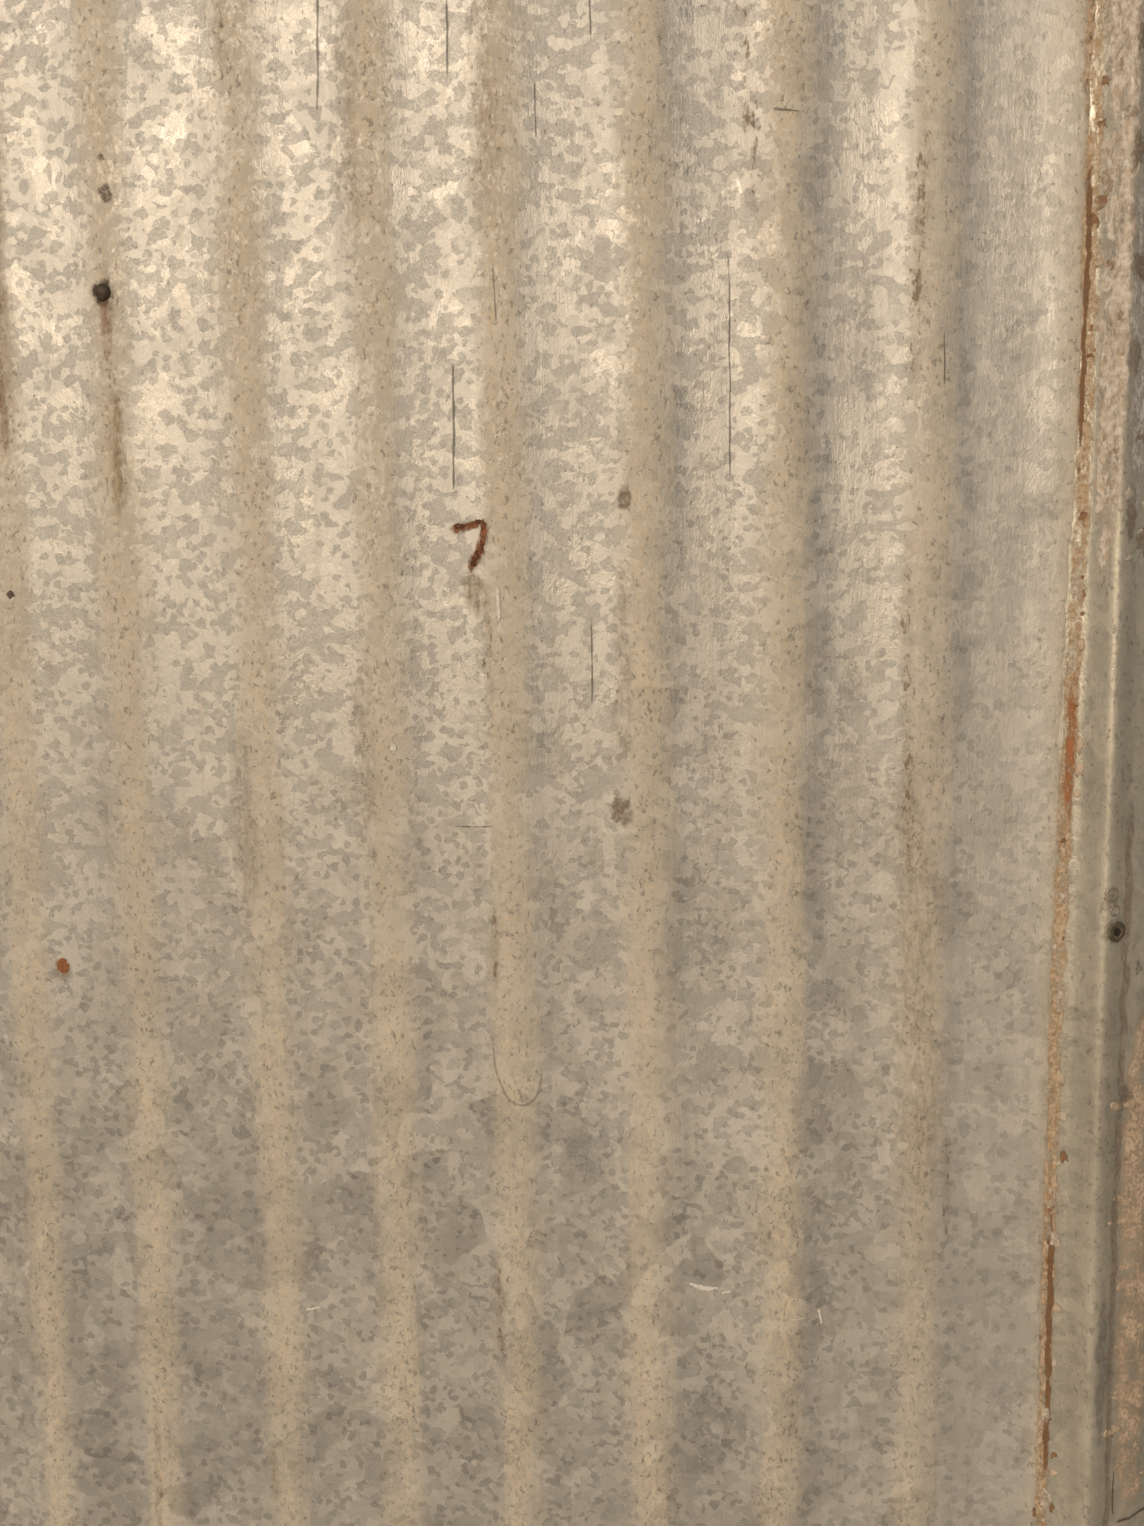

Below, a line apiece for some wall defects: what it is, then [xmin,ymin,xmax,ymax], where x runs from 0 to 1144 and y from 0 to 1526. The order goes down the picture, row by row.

corrosion [453,518,487,605]
corrosion [1032,0,1114,1526]
corrosion [57,958,69,975]